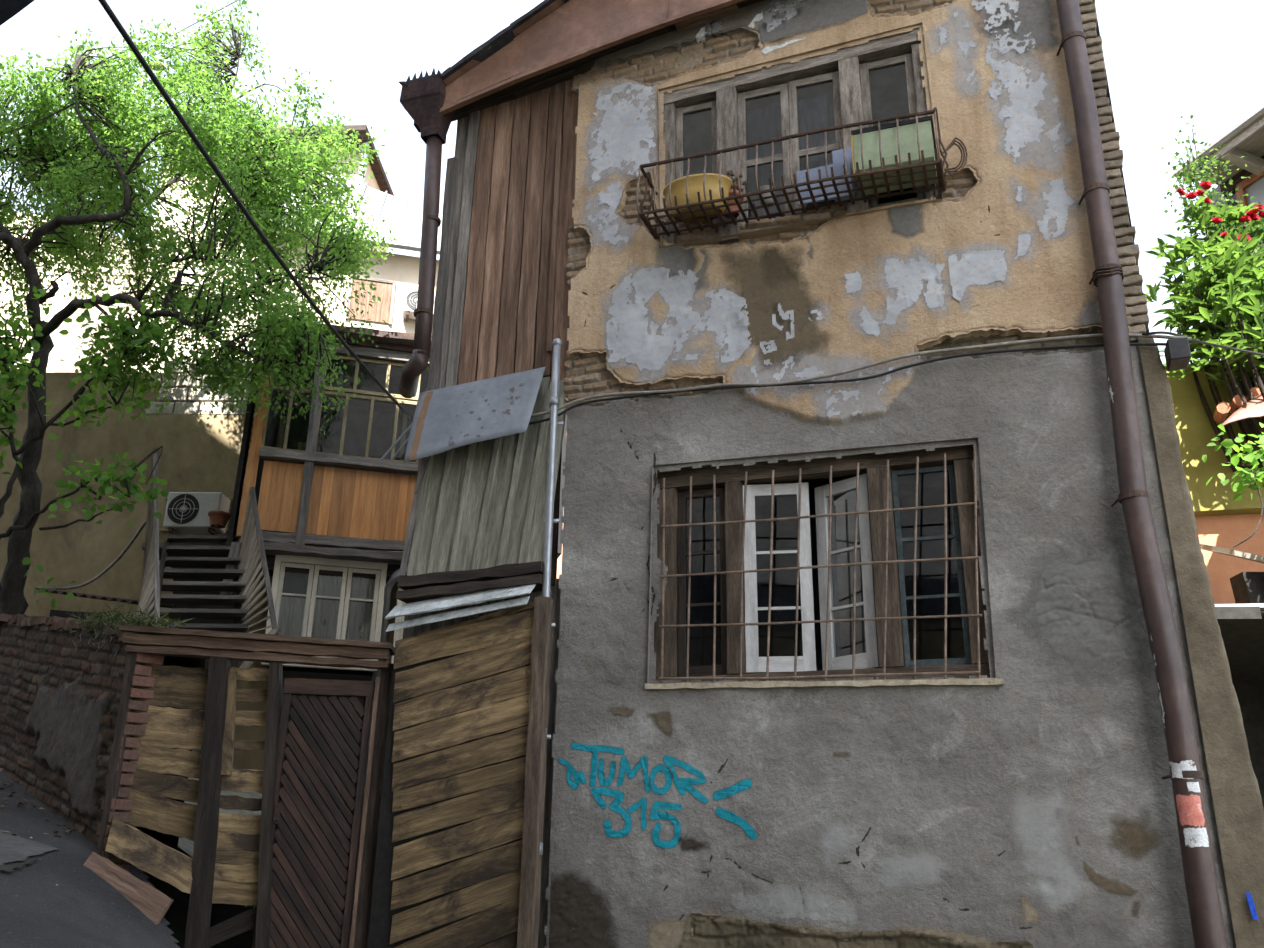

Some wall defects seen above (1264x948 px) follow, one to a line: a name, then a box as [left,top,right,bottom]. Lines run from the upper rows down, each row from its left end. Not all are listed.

spalling [566,0,875,286]
peeling [867,0,1072,163]
peeling [858,178,1075,337]
peeling [563,267,862,419]
spalling [679,913,1033,948]